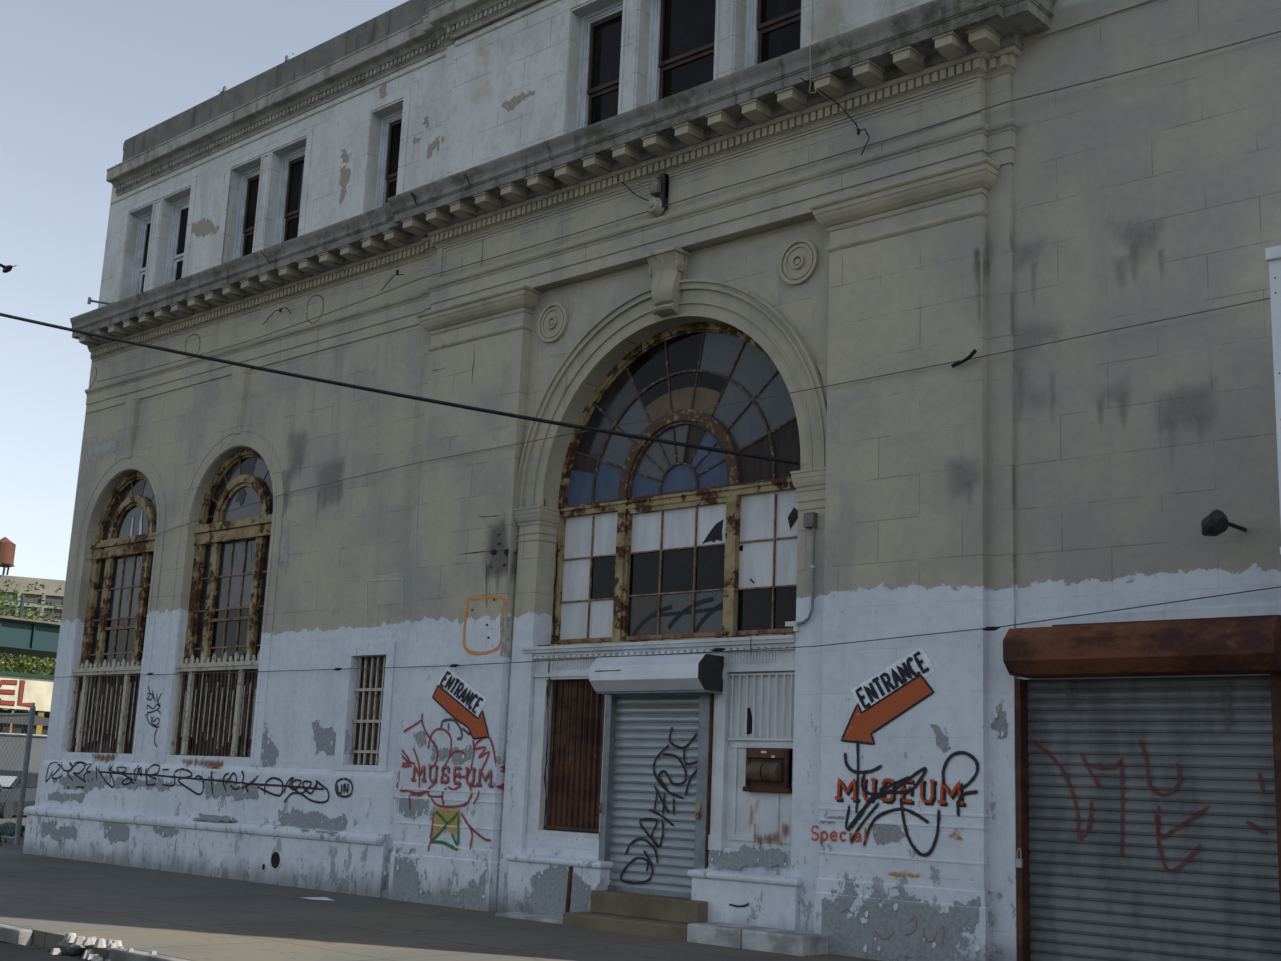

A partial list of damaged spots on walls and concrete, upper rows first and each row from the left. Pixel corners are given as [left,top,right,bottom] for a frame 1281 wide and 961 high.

peeling [413,116,444,158]
peeling [339,149,351,204]
peeling [191,218,219,237]
peeling [48,770,182,803]
peeling [192,723,279,822]
peeling [41,818,78,844]
peeling [101,814,129,845]
peeling [153,826,179,838]
peeling [274,806,348,837]
peeling [377,846,499,911]
peeling [821,878,1003,961]